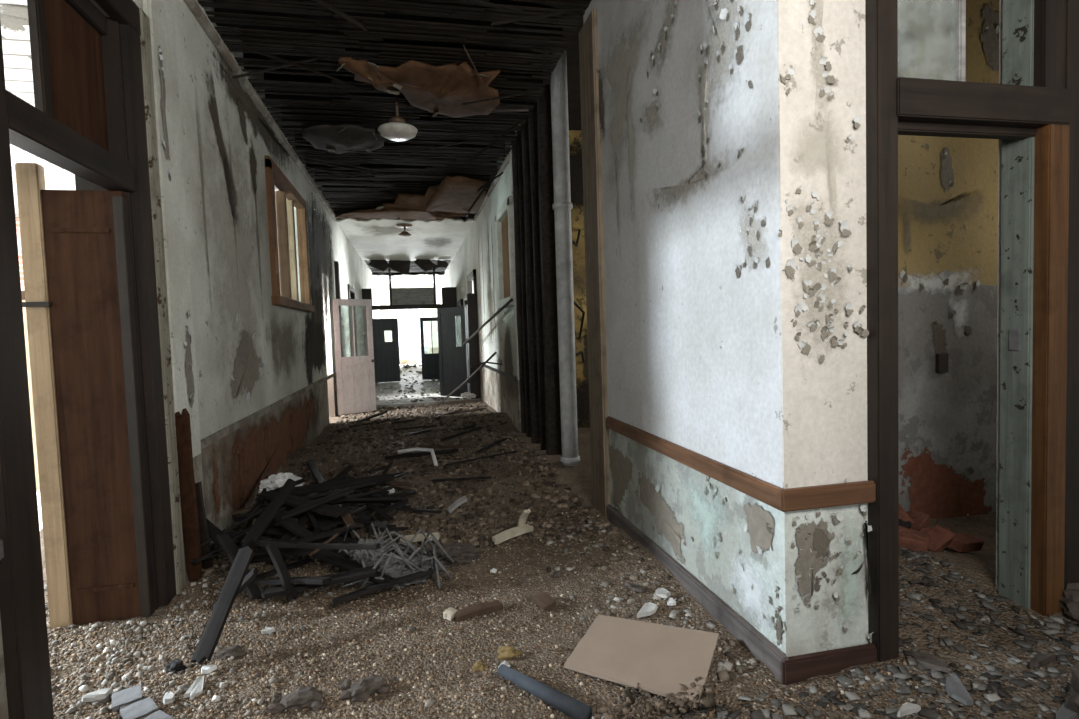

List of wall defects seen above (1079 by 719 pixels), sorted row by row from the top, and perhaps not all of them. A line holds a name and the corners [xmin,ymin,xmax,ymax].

peeling [337,57,500,118]
peeling [656,0,750,210]
leakage [197,49,289,345]
leakage [272,196,334,393]
peeling [336,175,488,221]
peeling [735,195,769,278]
peeling [778,186,869,363]
spalling [899,433,992,519]
spalling [732,502,872,645]